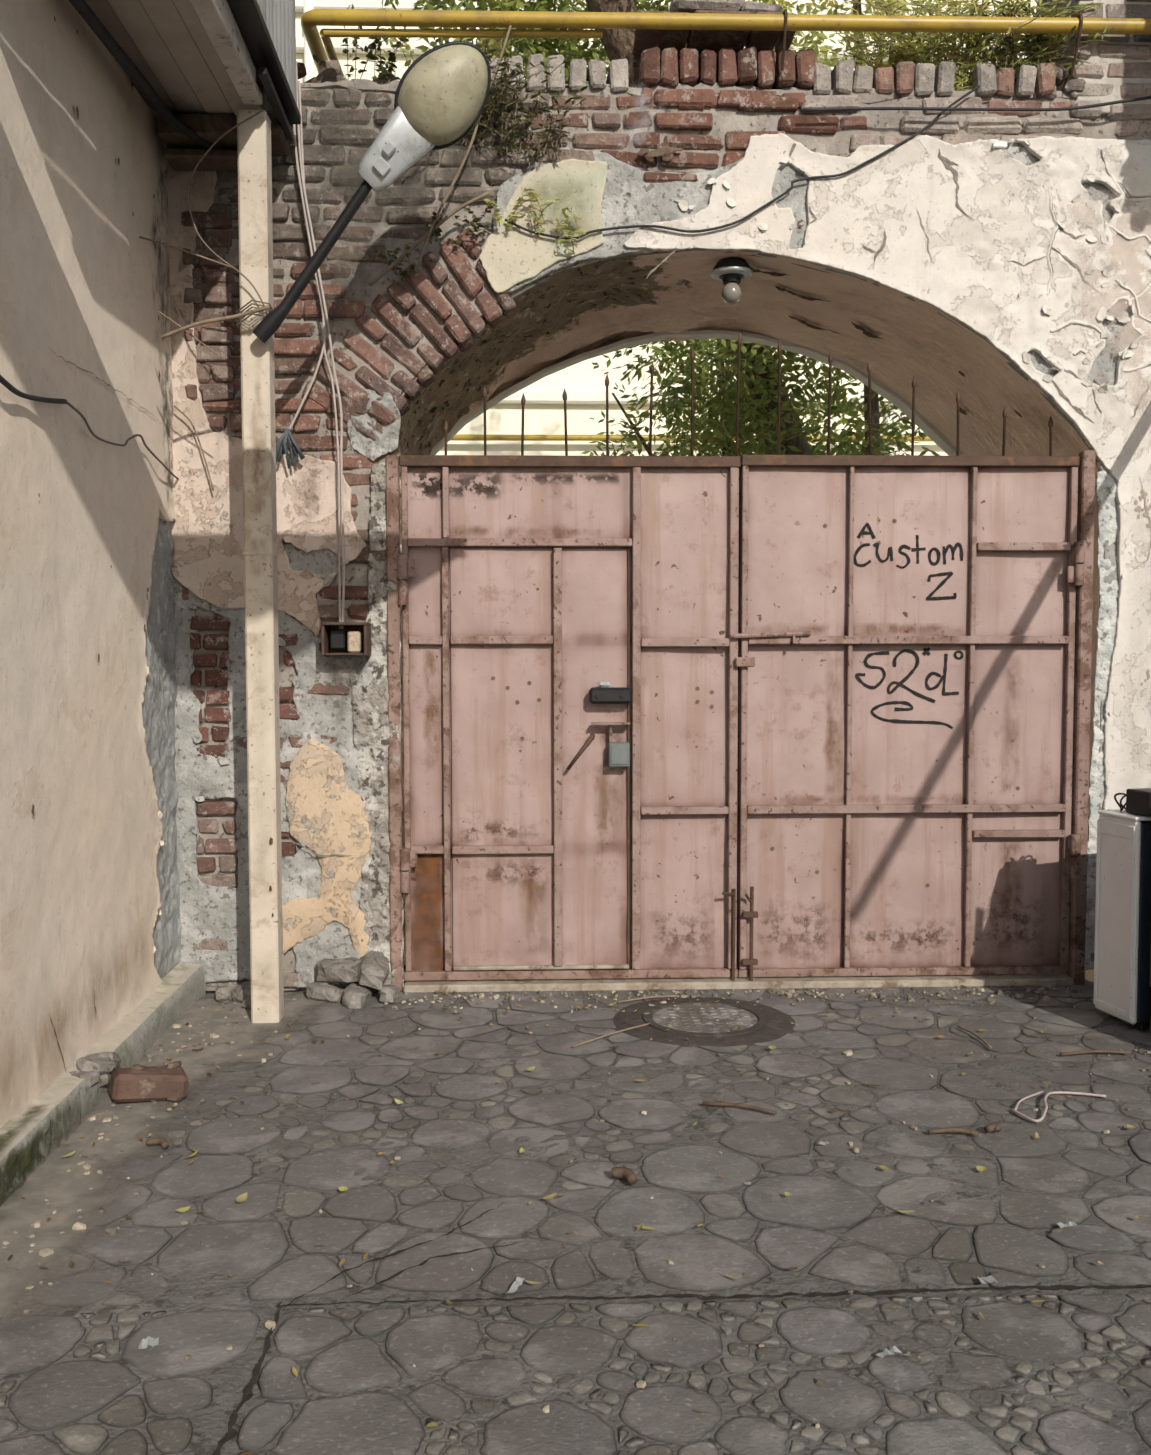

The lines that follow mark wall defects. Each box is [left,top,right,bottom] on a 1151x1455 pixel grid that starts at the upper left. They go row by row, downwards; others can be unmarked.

crack [938,149,973,219]
crack [862,231,887,263]
crack [916,208,932,262]
crack [1013,189,1100,298]
crack [1049,366,1150,423]
spalling [278,536,349,586]
spalling [141,517,249,979]
flaking render [278,633,302,720]
spalling [346,389,404,989]
spalling [1084,471,1151,970]
flaking render [269,832,305,860]
corrosion [868,931,940,943]